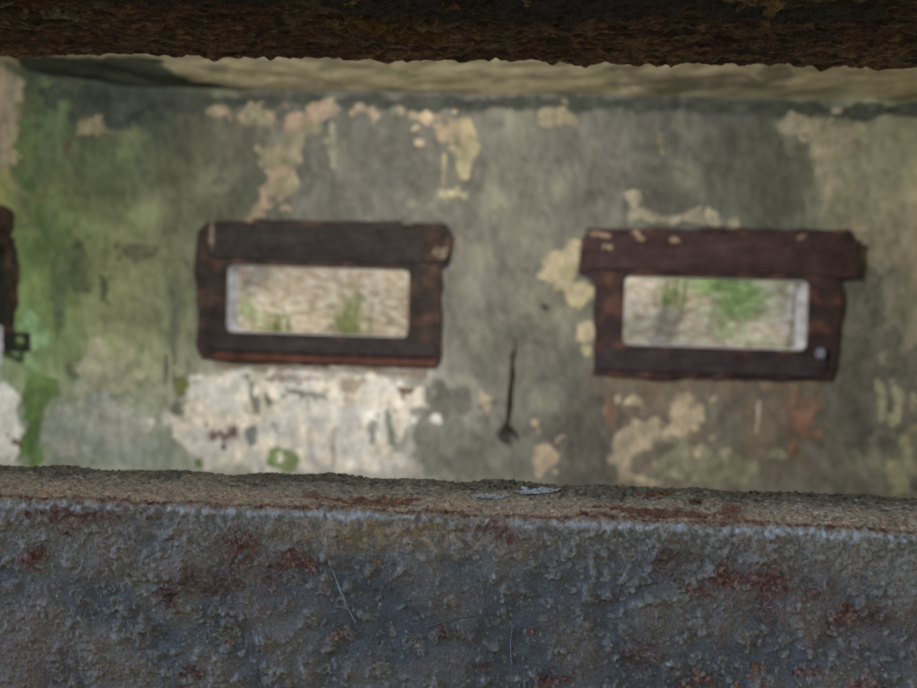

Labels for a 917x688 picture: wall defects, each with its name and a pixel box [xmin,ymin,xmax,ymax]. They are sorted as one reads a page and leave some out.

peeling [206,93,380,218]
peeling [396,105,482,200]
leakage [9,55,917,229]
peeling [134,365,494,478]
peeling [607,386,788,490]